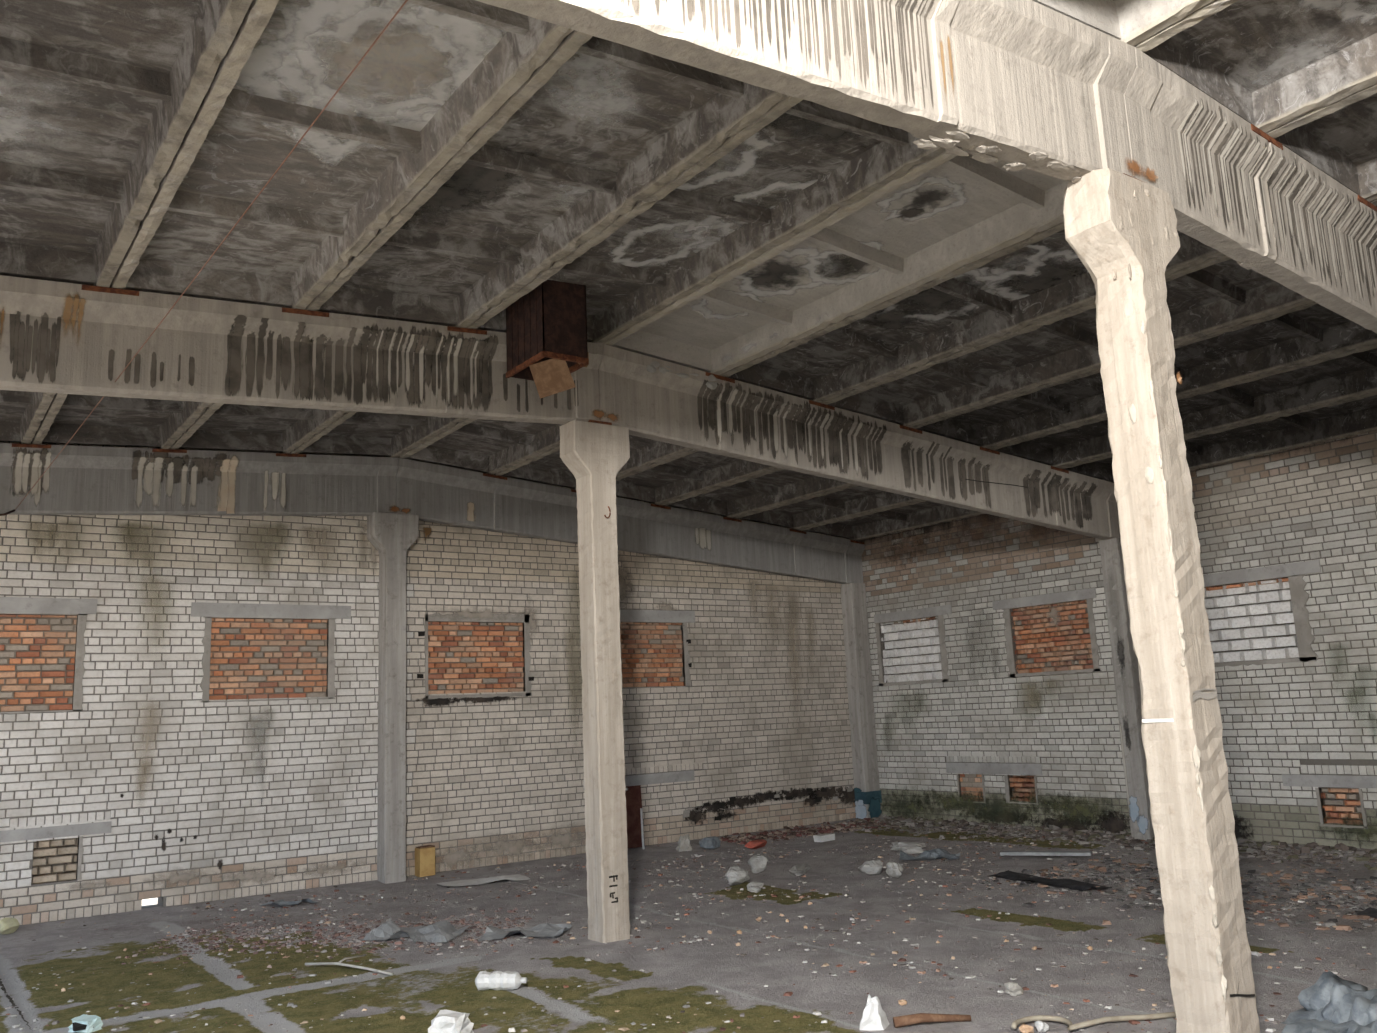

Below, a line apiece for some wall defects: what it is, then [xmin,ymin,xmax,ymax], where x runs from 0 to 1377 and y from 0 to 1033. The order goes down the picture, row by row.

water stain [236,0,502,131]
water stain [273,124,375,162]
water stain [677,133,774,191]
water stain [734,180,818,202]
water stain [877,177,966,221]
rust [1127,160,1157,181]
water stain [611,215,735,267]
water stain [691,242,882,319]
water stain [865,245,1088,332]